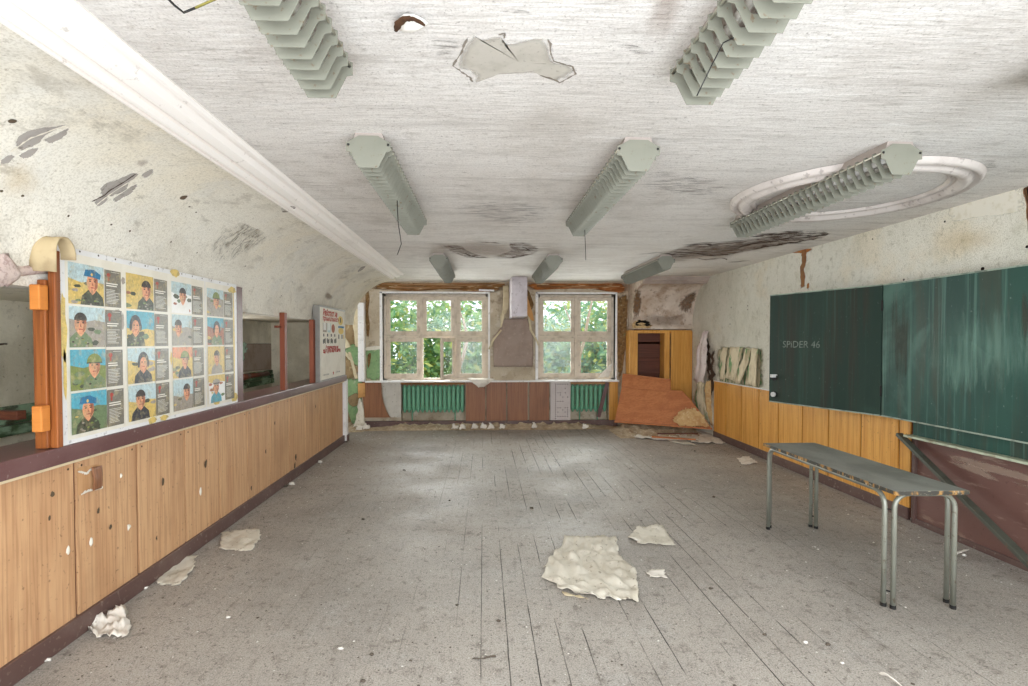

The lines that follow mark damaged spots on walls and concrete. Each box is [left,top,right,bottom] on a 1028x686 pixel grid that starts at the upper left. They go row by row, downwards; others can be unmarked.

flaking render [452,33,577,83]
peeling [1,125,68,164]
peeling [95,169,153,206]
rust [793,249,812,289]